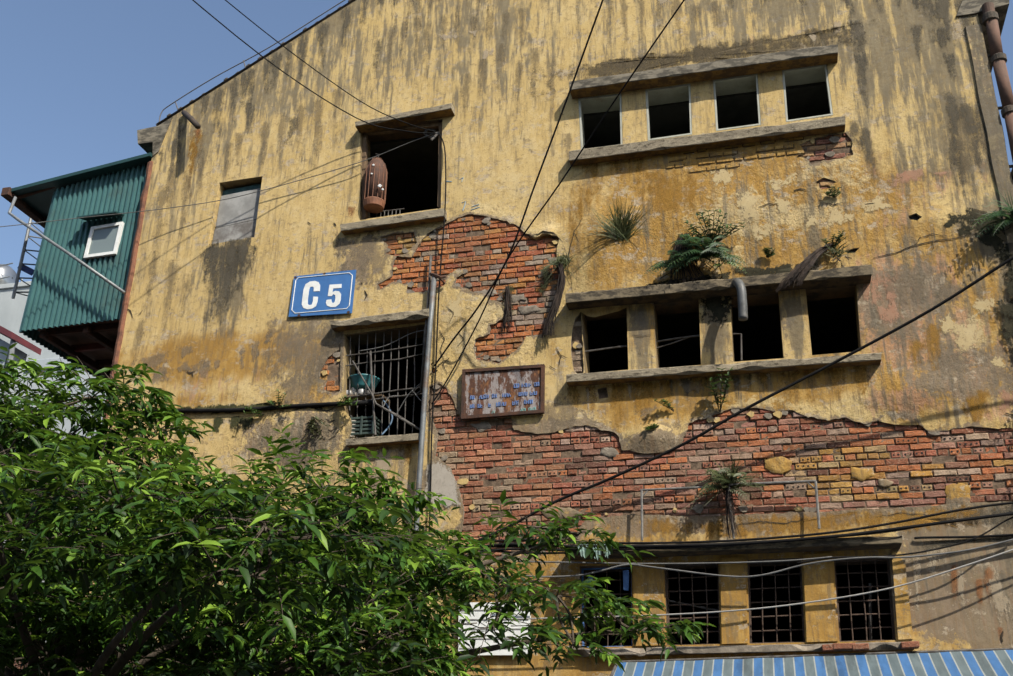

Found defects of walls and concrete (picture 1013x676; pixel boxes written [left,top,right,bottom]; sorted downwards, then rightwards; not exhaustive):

damp [201,22,328,133]
damp [544,0,869,95]
damp [914,0,973,77]
flaking render [666,133,853,240]
damp [850,122,877,177]
damp [203,237,254,324]
flaking render [319,335,343,394]
flaking render [378,214,563,363]
flaking render [571,312,584,374]
peeling [939,298,995,353]
damp [943,207,1013,355]
flaking render [428,362,1013,557]